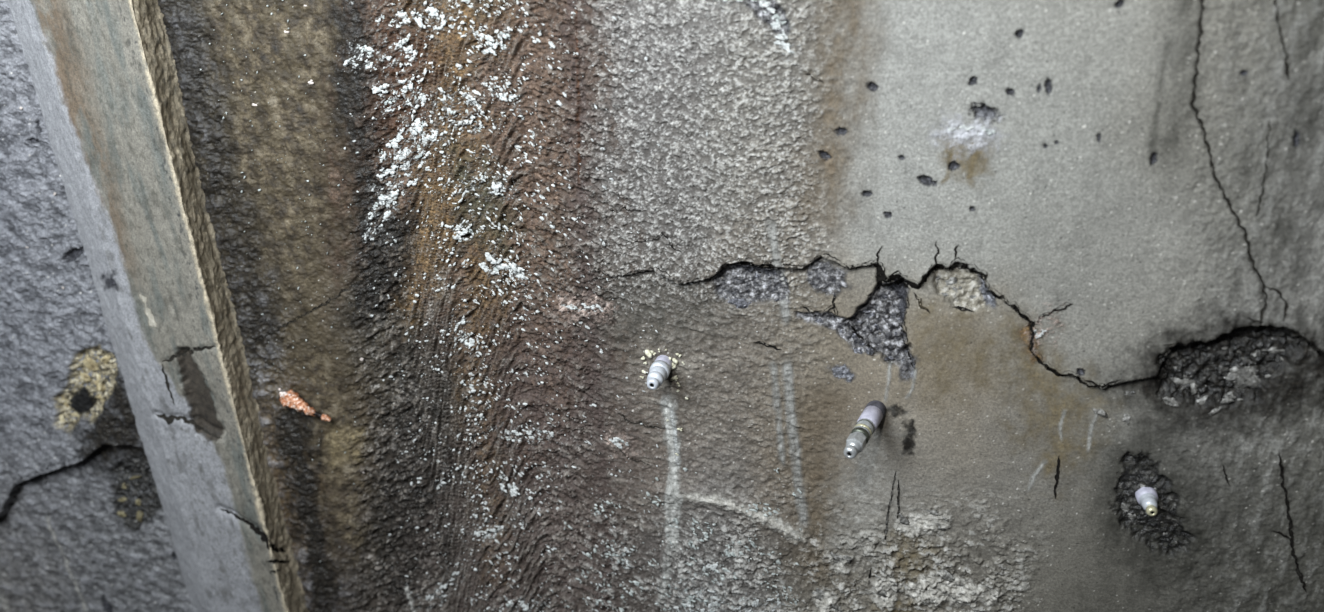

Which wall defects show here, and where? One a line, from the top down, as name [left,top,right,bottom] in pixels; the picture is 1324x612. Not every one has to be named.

damp [476,24,511,56]
damp [333,0,483,328]
crack [1162,0,1324,357]
spalling [54,345,118,431]
efflorescence [478,252,532,281]
crack [588,203,1121,388]
spalling [796,278,913,382]
spalling [1158,326,1303,416]
crack [0,438,111,520]
damp [366,334,462,605]
spalling [1113,452,1195,554]
crack [1273,454,1307,593]